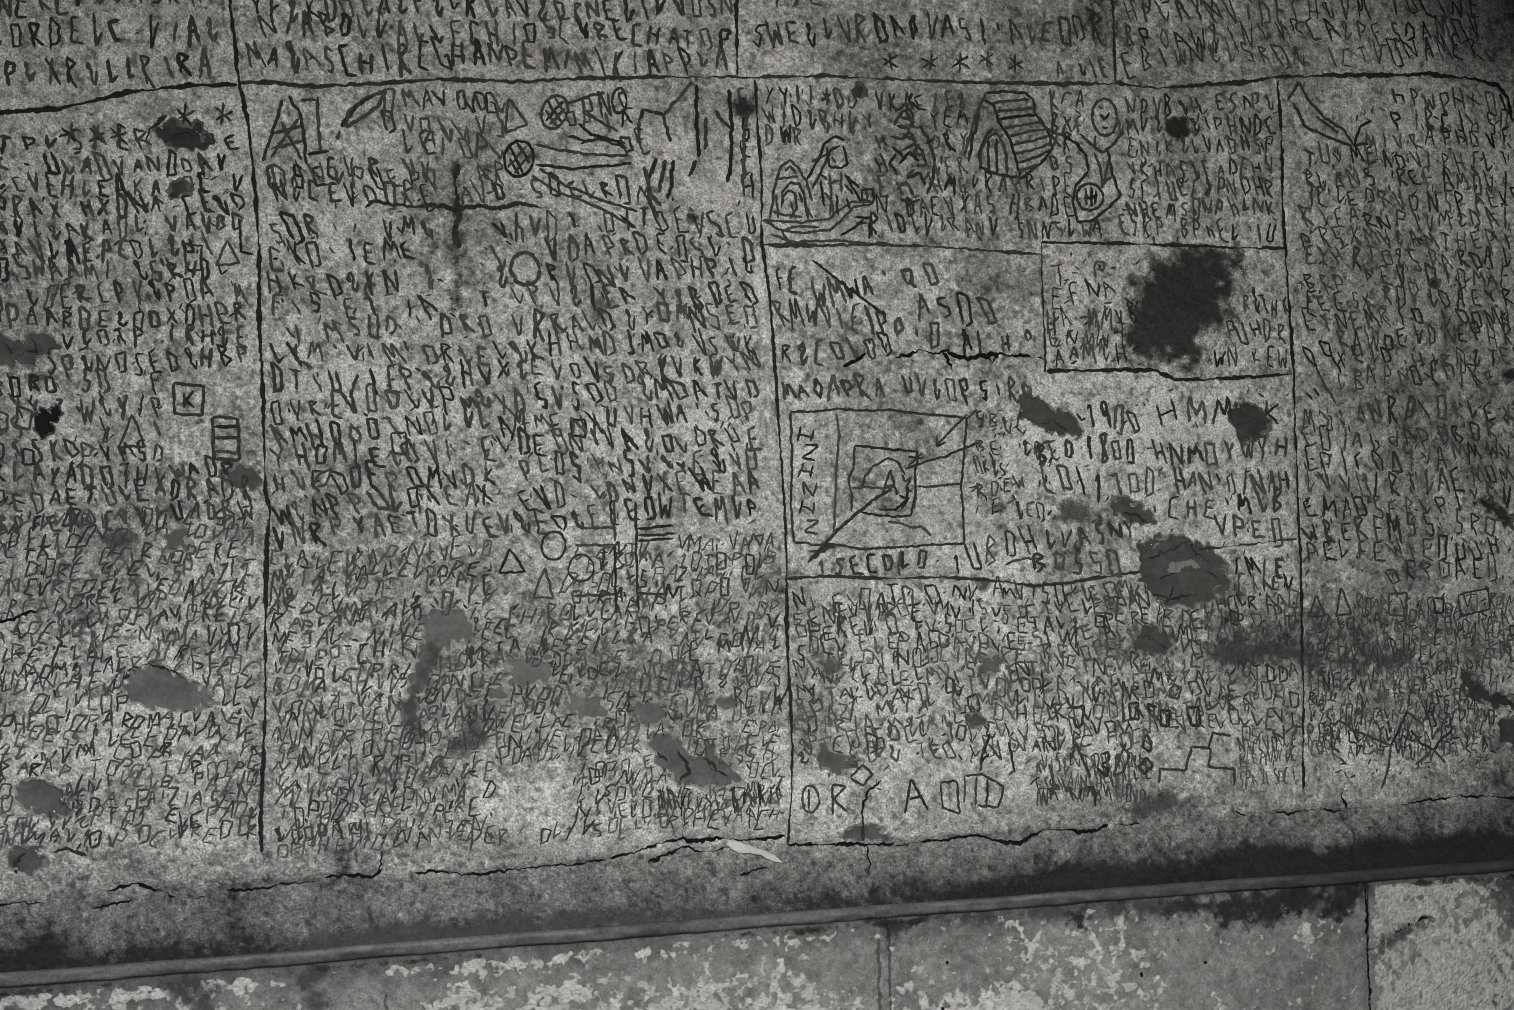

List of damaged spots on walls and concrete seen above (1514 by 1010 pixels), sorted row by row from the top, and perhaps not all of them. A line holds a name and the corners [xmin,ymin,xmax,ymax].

damp [1115,241,1245,378]
crack [1236,786,1351,816]
crack [1401,794,1514,805]
crack [92,780,1140,909]
crack [0,900,46,908]